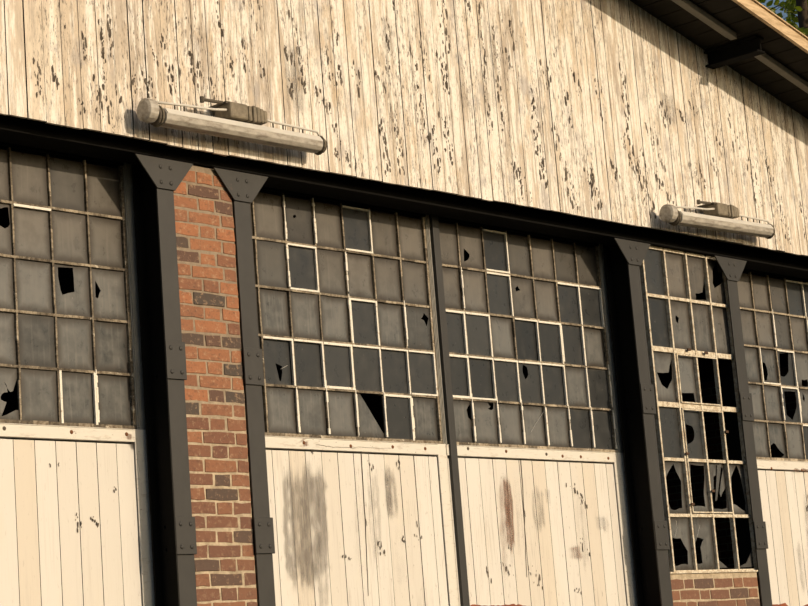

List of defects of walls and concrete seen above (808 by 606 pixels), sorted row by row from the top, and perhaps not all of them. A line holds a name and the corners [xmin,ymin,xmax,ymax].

peeling [79,14,122,133]
peeling [152,33,177,95]
peeling [284,10,331,114]
peeling [410,0,451,95]
peeling [465,0,515,135]
peeling [379,114,405,177]
peeling [416,84,453,173]
peeling [531,88,548,188]
peeling [584,168,602,210]
peeling [619,61,698,219]
damp [284,475,326,582]
rust [504,482,514,551]